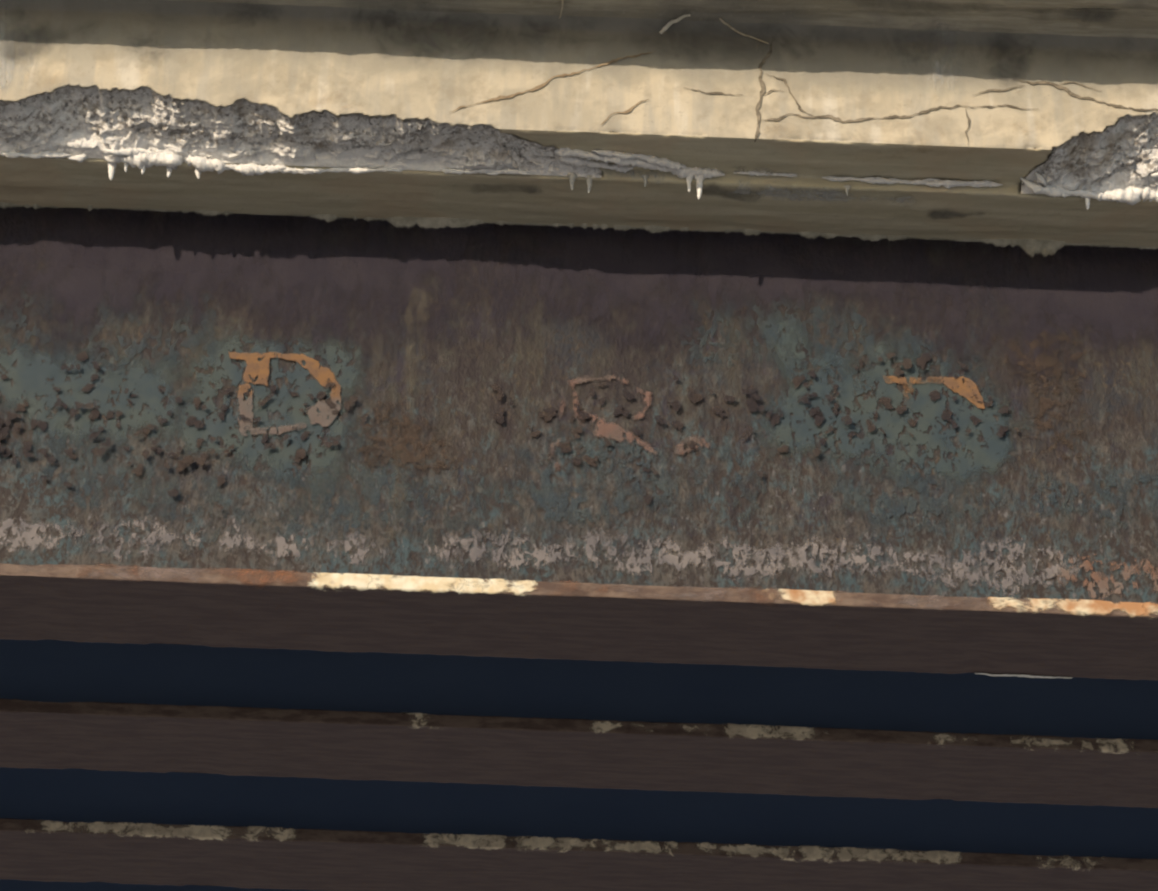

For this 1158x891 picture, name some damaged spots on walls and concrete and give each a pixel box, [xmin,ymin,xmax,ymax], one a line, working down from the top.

crack [451,51,656,112]
crack [601,99,649,125]
crack [687,39,1158,143]
water stain [0,151,88,162]
water stain [104,147,404,176]
water stain [1020,171,1158,205]
corrosion [52,351,369,486]
corrosion [791,370,917,456]
peeling [0,517,200,580]
corrosion [219,568,297,584]
peeling [219,516,313,564]
peeling [310,529,1158,617]